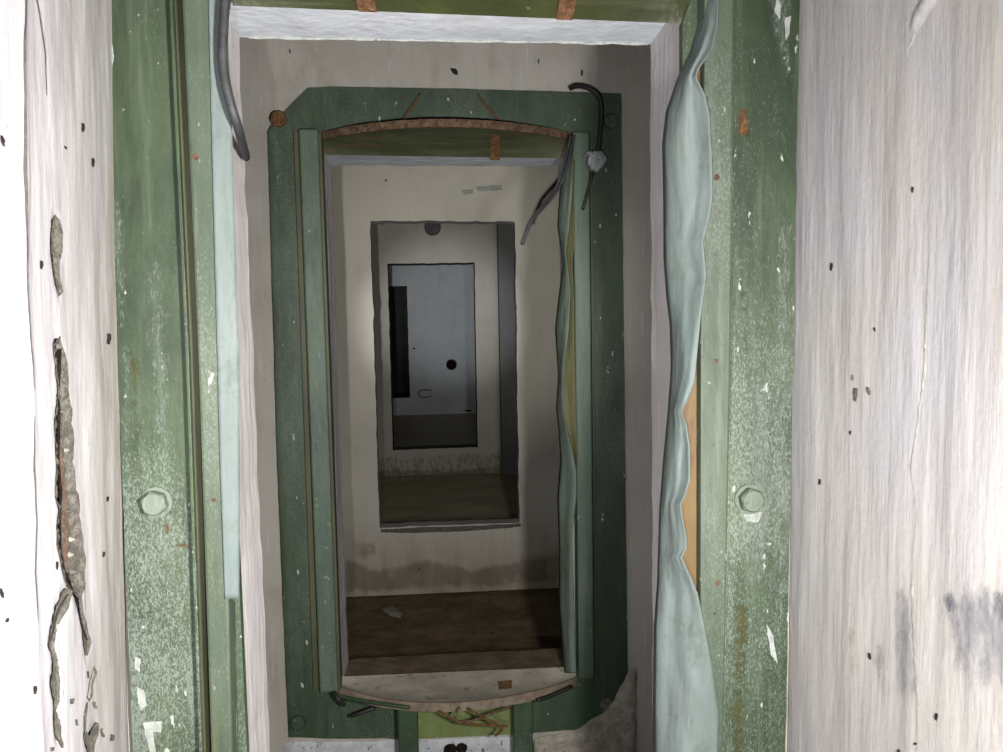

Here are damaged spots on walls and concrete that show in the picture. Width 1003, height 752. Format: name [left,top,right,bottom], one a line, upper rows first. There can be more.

spalling [50,215,63,296]